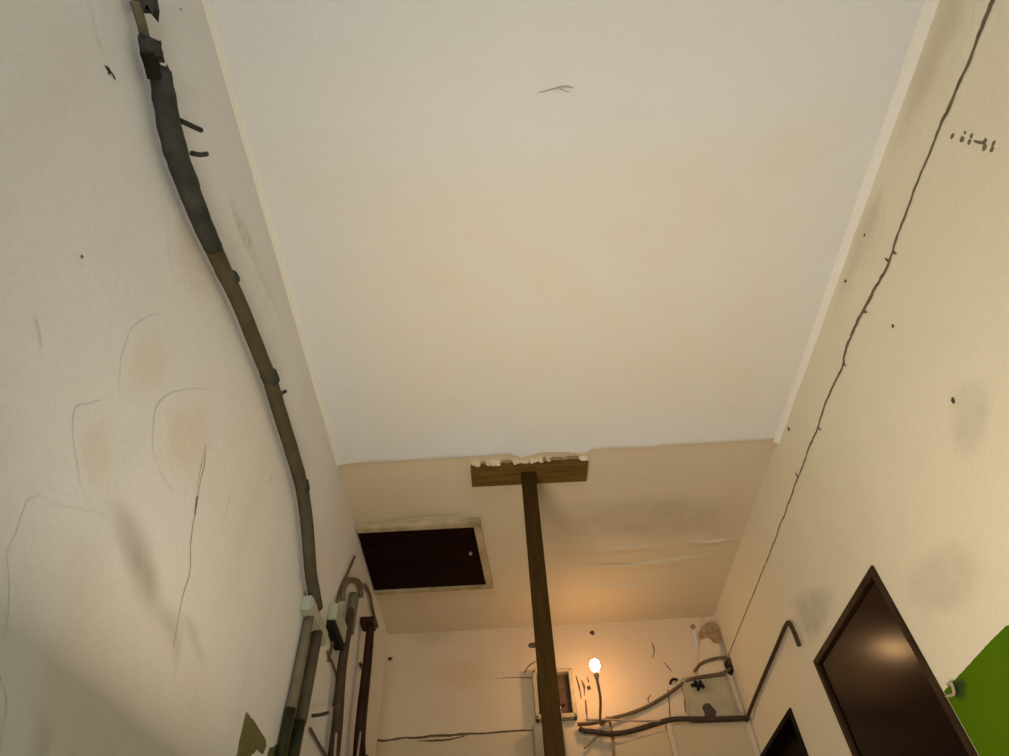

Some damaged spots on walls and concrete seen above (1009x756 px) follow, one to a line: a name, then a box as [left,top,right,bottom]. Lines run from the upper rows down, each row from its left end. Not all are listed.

crack [728,0,995,655]
crack [173,448,206,647]
peeling [237,711,277,756]